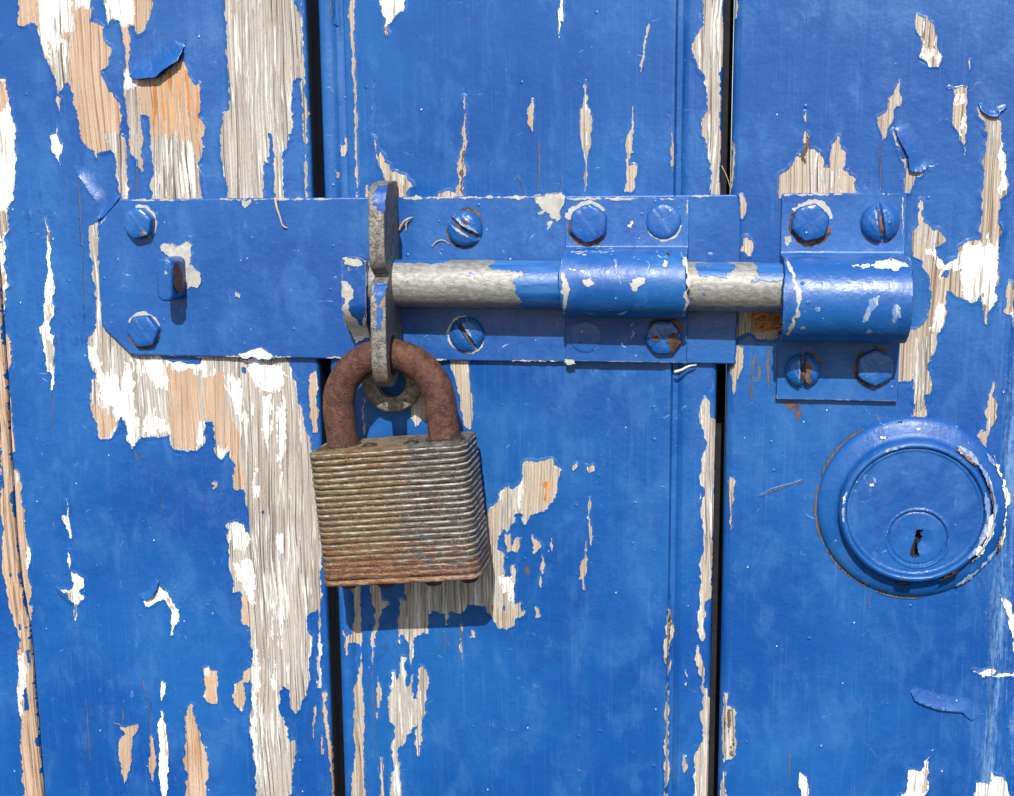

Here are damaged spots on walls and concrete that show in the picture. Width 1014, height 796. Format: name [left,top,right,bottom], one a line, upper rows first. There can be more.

peeling [0,65,45,796]
peeling [14,0,335,796]
peeling [334,0,417,197]
corrosion [651,332,681,353]
peeling [689,0,749,221]
peeling [740,233,757,260]
peeling [728,260,806,399]
peeling [774,110,860,215]
peeling [852,58,1014,430]
peeling [341,456,597,796]
peeling [895,749,936,796]
peeling [971,770,1013,796]